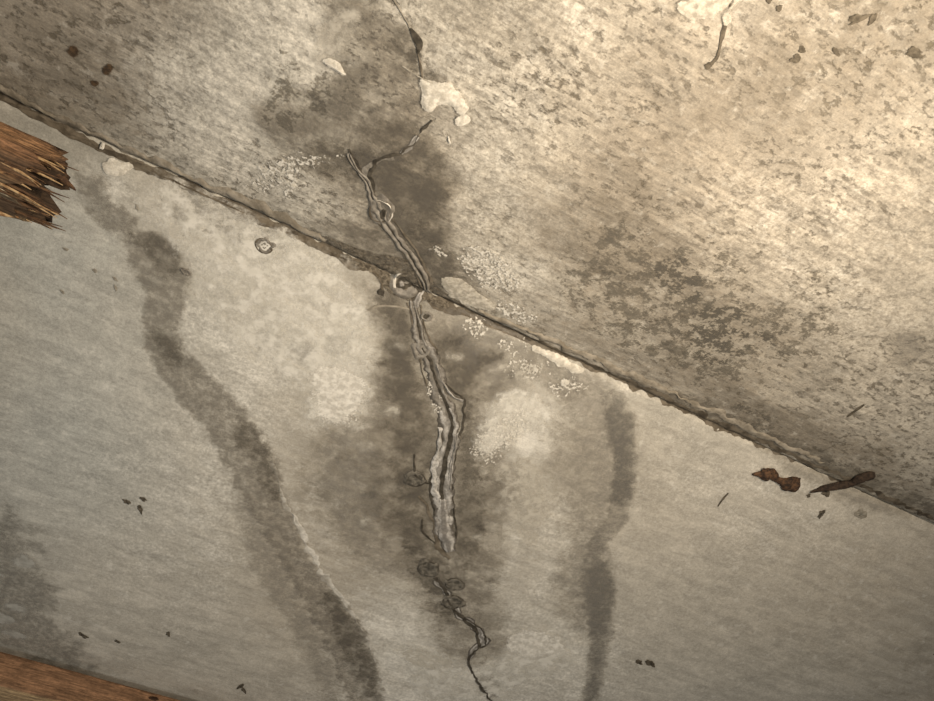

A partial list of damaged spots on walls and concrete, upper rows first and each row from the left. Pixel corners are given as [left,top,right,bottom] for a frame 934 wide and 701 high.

water stain [317,10,358,61]
peeling [418,76,471,126]
water stain [252,152,342,199]
water stain [147,178,372,427]
water stain [462,316,489,339]
water stain [433,245,537,324]
crack [347,120,493,701]
water stain [469,337,588,546]
water stain [272,461,379,664]